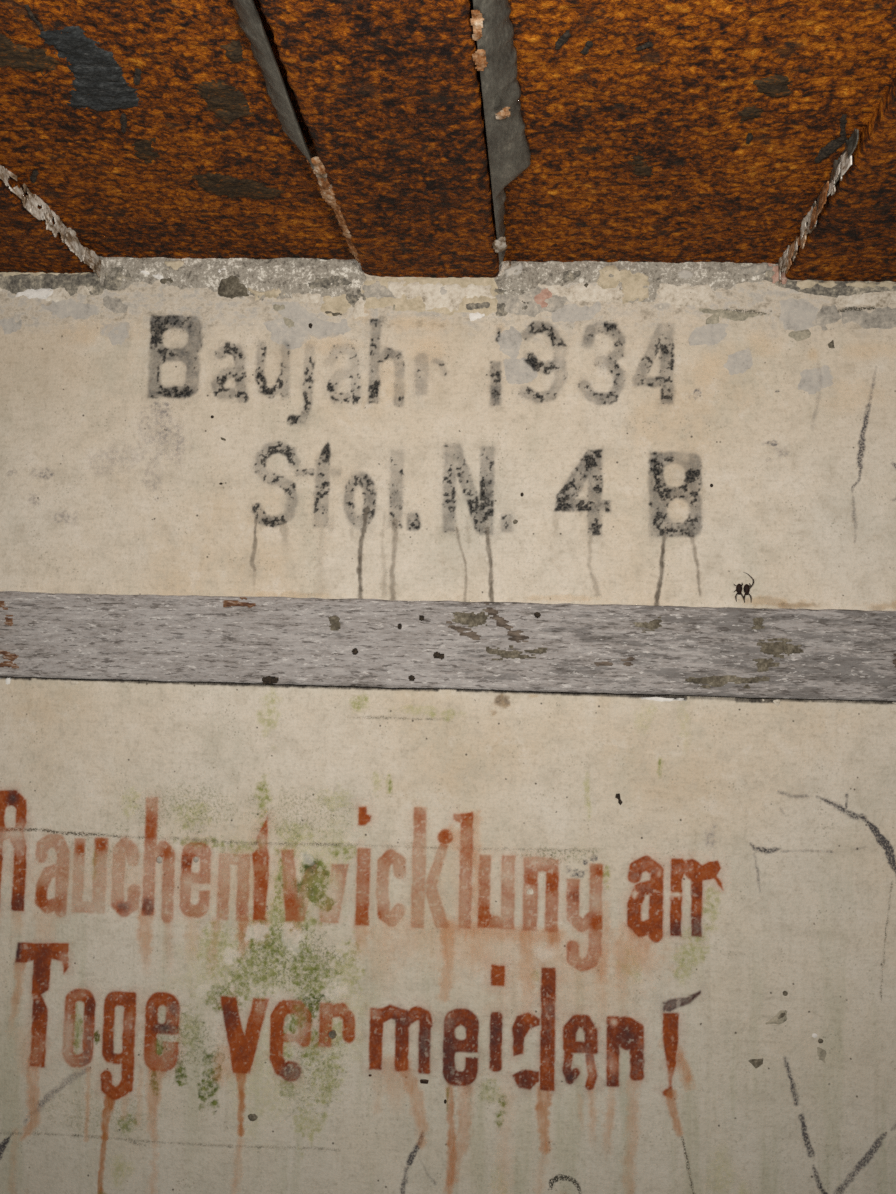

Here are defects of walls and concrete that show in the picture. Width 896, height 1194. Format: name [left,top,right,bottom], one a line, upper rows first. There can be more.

peeling [471,10,488,71]
peeling [495,107,510,120]
flaking render [0,128,896,385]
water stain [236,1073,246,1136]